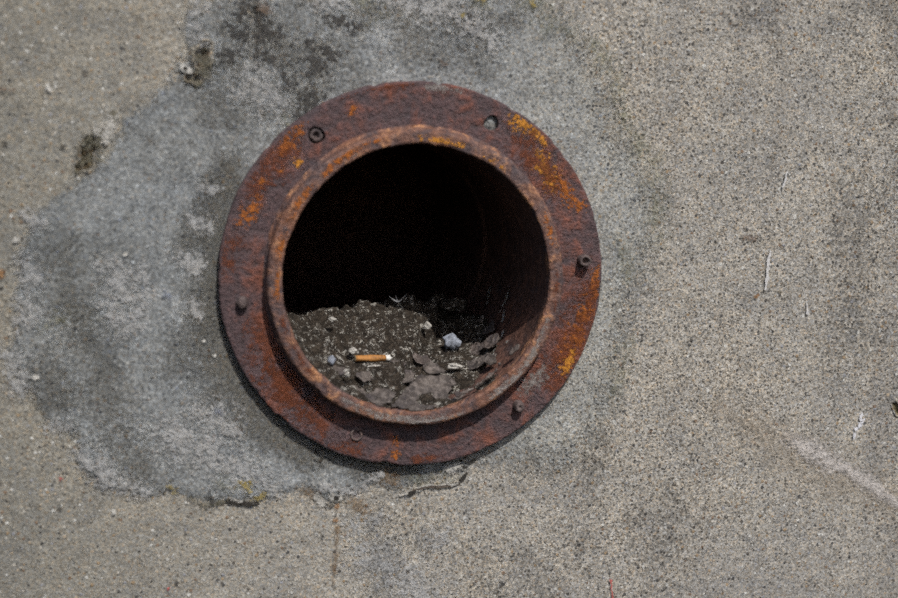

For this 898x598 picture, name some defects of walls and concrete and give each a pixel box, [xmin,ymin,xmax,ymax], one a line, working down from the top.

water stain [187,0,522,143]
corrosion [234,125,306,230]
corrosion [419,136,465,148]
corrosion [508,113,589,213]
corrosion [343,370,461,424]
corrosion [402,353,433,384]
corrosion [447,315,501,397]
corrosion [490,266,600,399]